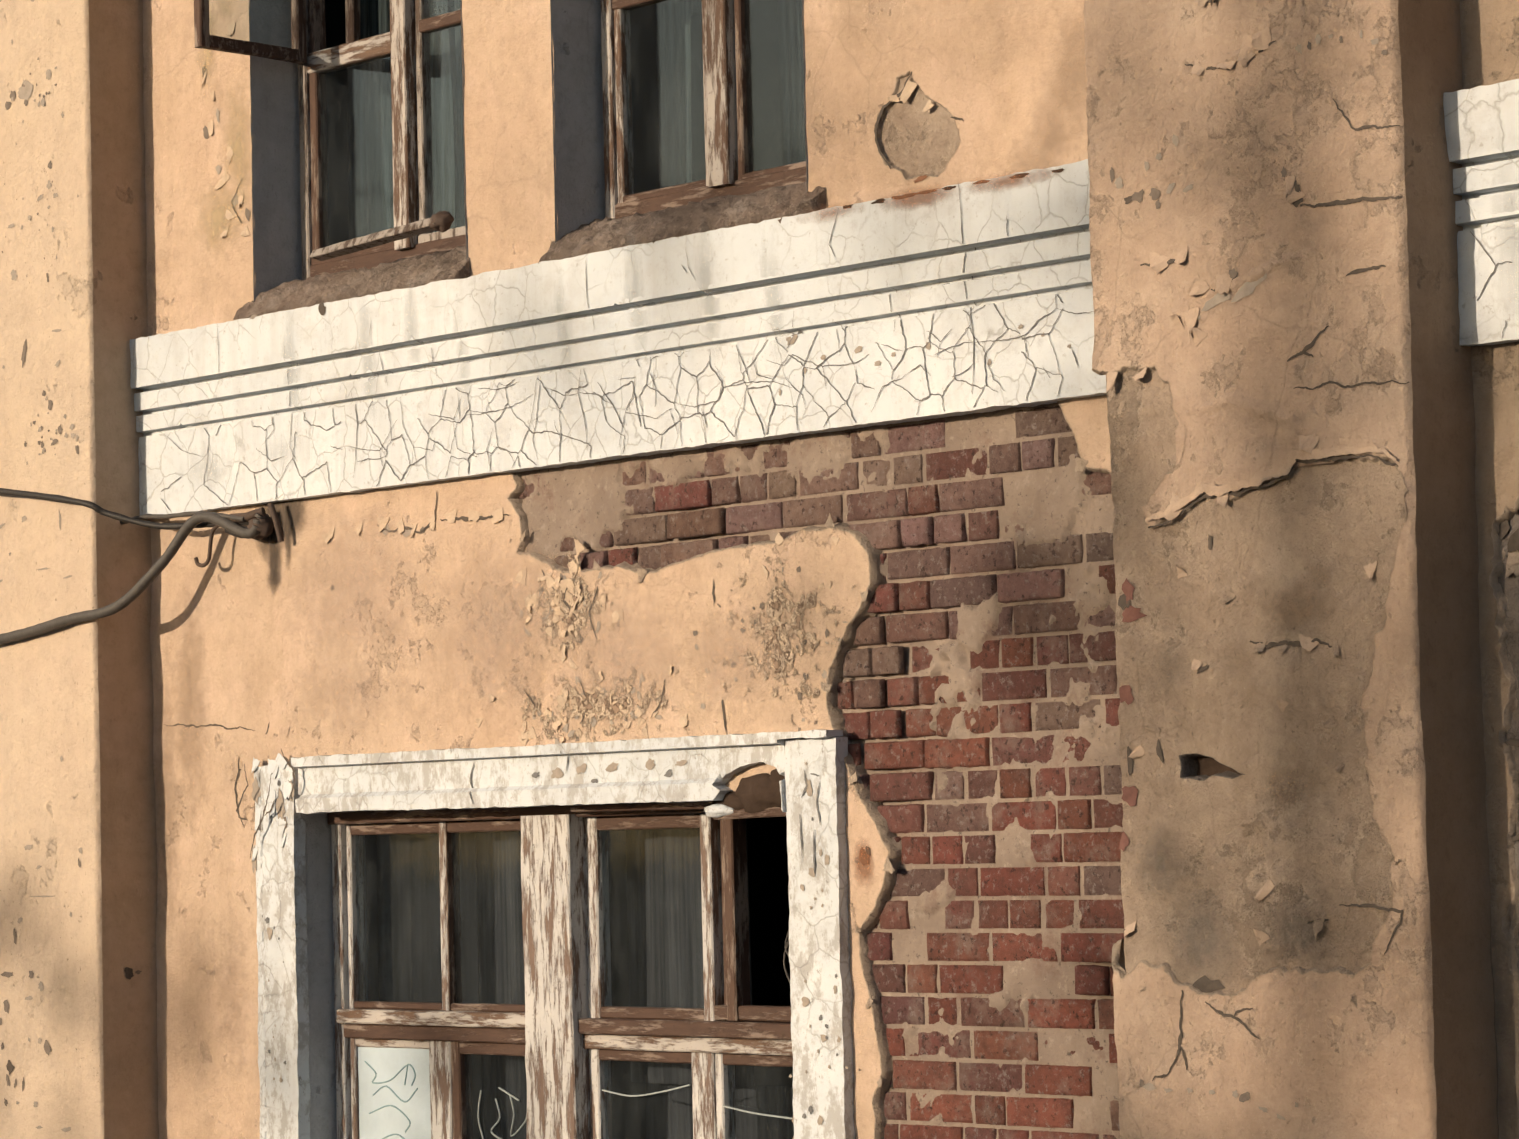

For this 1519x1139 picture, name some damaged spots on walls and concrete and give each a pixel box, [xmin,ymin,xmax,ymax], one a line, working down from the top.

peeling [1185,27,1276,76]
spalling [874,71,964,183]
crack [1333,99,1400,131]
crack [1346,265,1386,276]
crack [1470,231,1512,337]
crack [161,184,1094,510]
crack [1287,325,1409,390]
crack [163,723,295,858]
spalling [354,366,1408,1139]
spalling [1489,495,1519,982]
crack [1152,990,1260,1081]